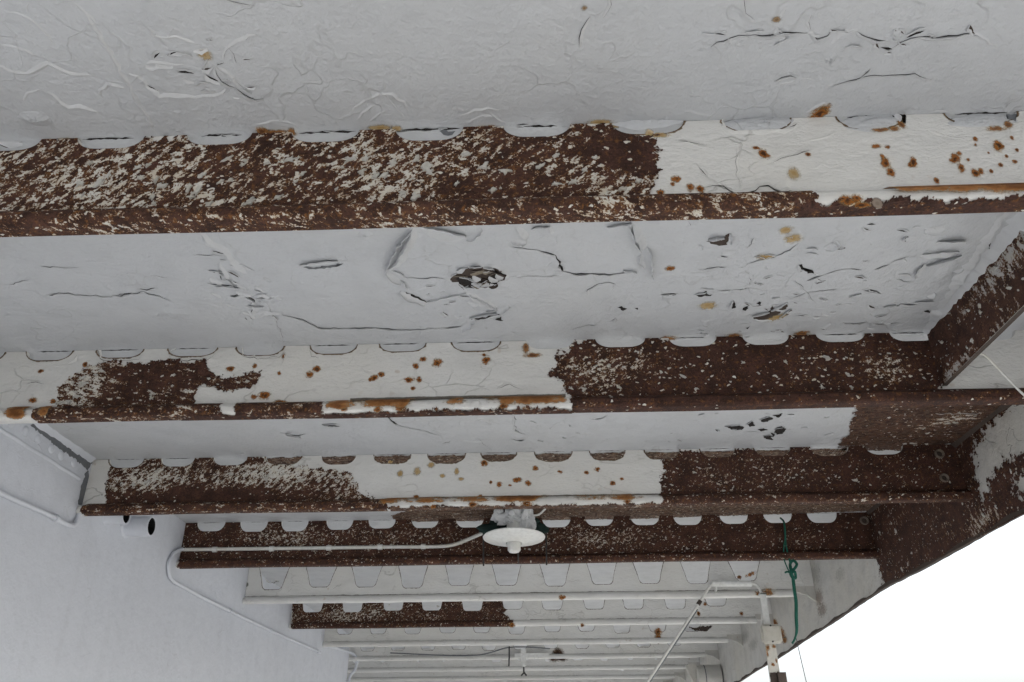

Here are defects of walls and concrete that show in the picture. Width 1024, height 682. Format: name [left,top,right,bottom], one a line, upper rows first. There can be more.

peeling [145,38,230,94]
crack [710,0,997,89]
corrosion [0,120,1024,243]
crack [9,266,170,301]
peeling [385,227,511,332]
crack [511,247,637,296]
peeling [698,233,734,262]
peeling [729,237,897,338]
peeling [898,241,967,287]
corrosion [3,230,1024,585]
peeling [695,413,794,440]
corrosion [291,601,514,629]